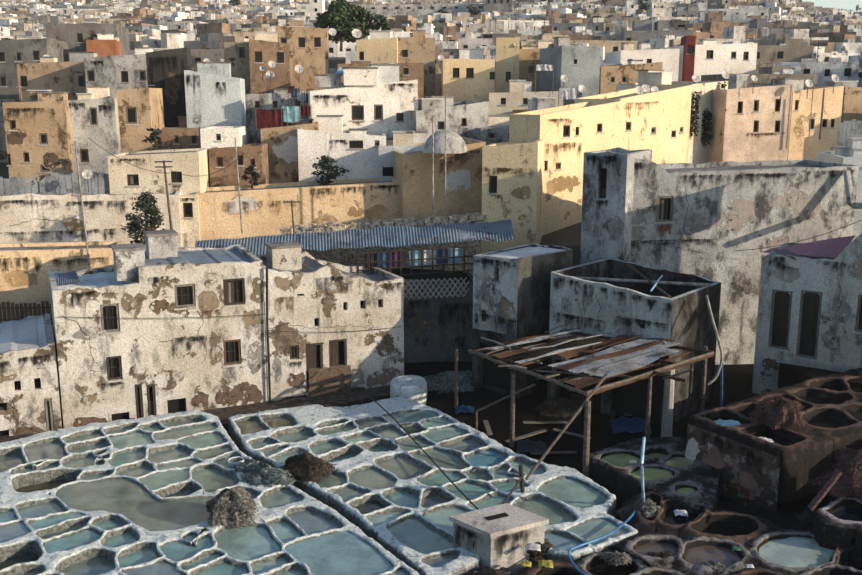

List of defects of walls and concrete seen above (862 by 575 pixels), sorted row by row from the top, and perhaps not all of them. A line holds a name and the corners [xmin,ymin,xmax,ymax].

peeling [510,185,532,201]
peeling [545,174,581,195]
damp [685,173,795,186]
peeling [318,280,350,297]
peeling [119,291,136,314]
spalling [148,298,171,316]
peeling [241,274,302,336]
peeling [207,330,224,367]
spalling [271,356,307,390]
spalling [190,381,264,410]
peeling [684,428,762,502]